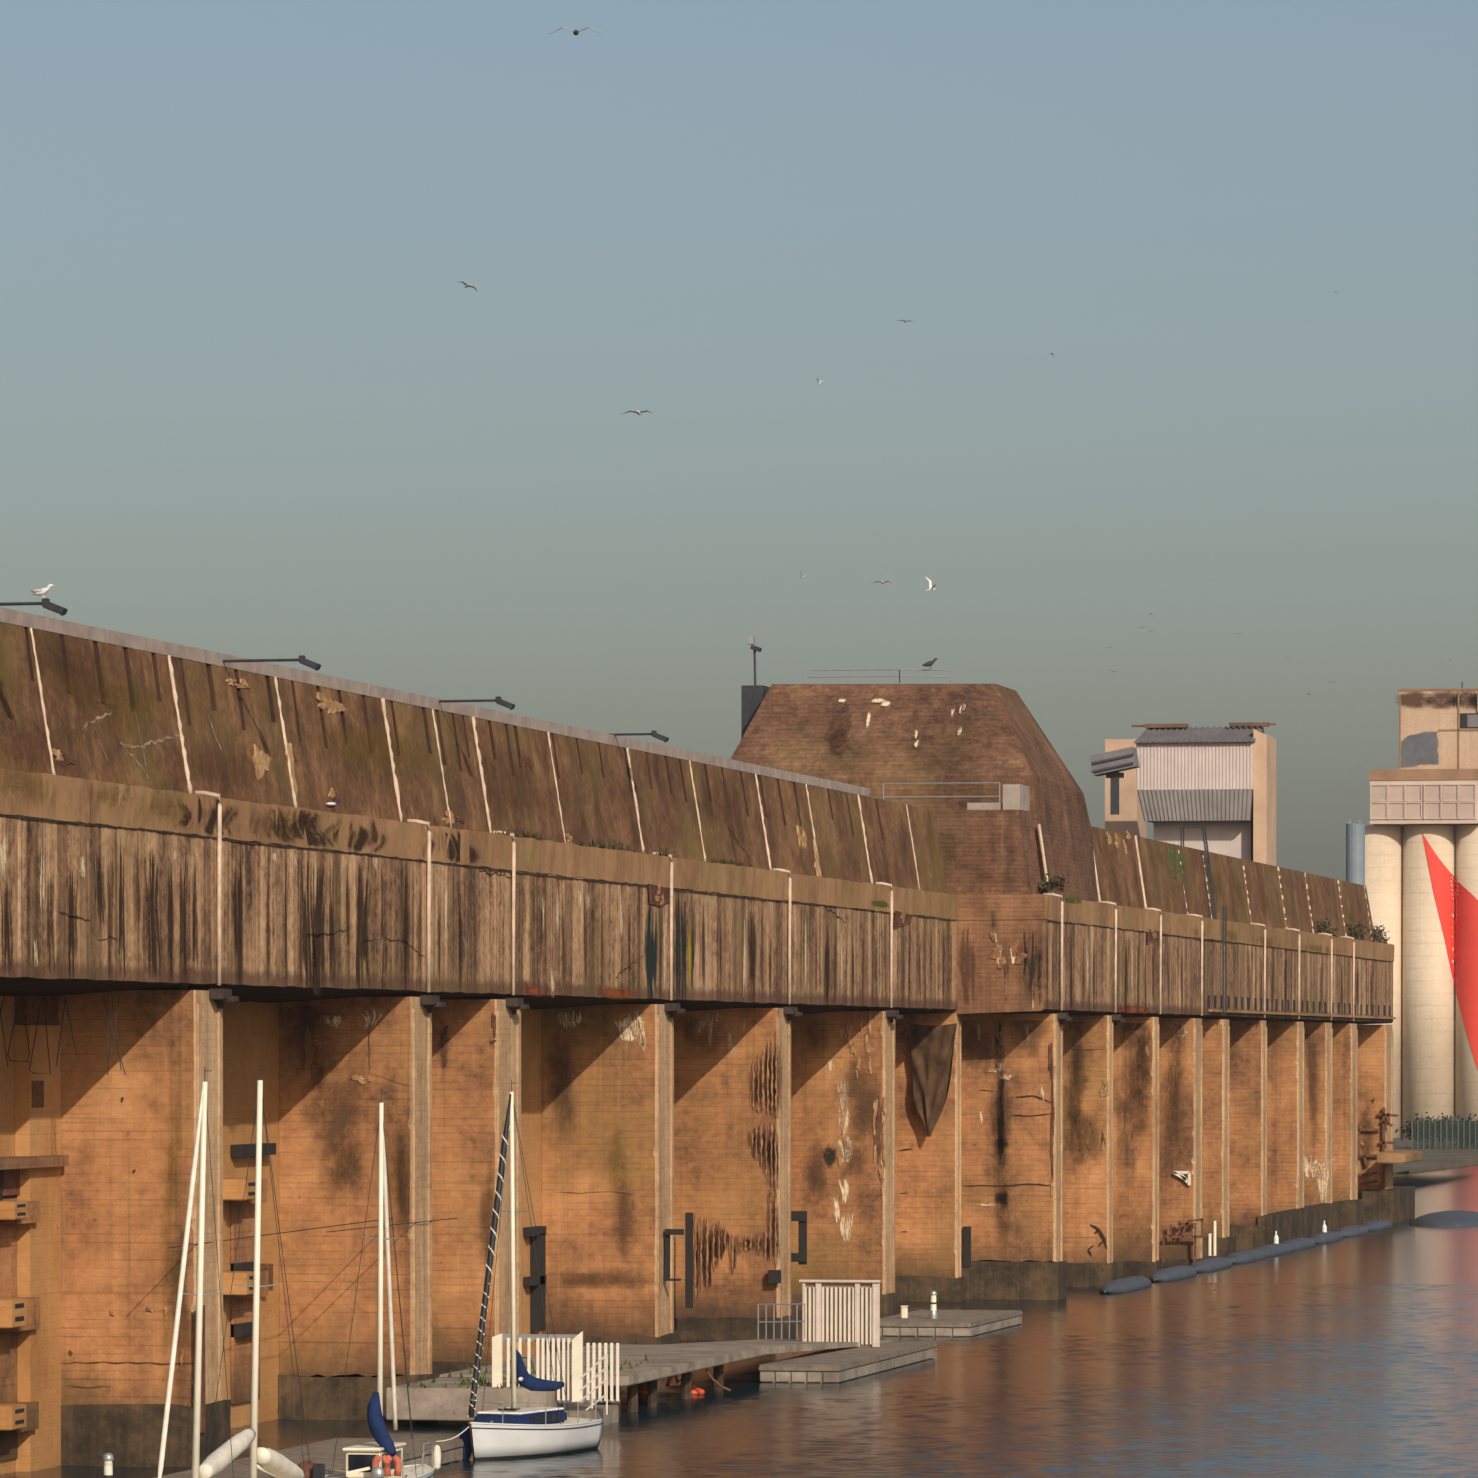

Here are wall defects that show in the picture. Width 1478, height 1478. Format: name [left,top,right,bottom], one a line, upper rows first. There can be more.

water stain [178,798,237,835]
spalling [252,742,298,797]
crack [0,711,956,923]
water stain [0,835,13,973]
crack [59,911,143,958]
water stain [34,847,198,985]
water stain [234,864,243,985]
crack [303,928,425,957]
water stain [267,810,478,1182]
water stain [578,890,721,1050]
spalling [828,1009,872,1242]
spalling [873,1098,887,1194]